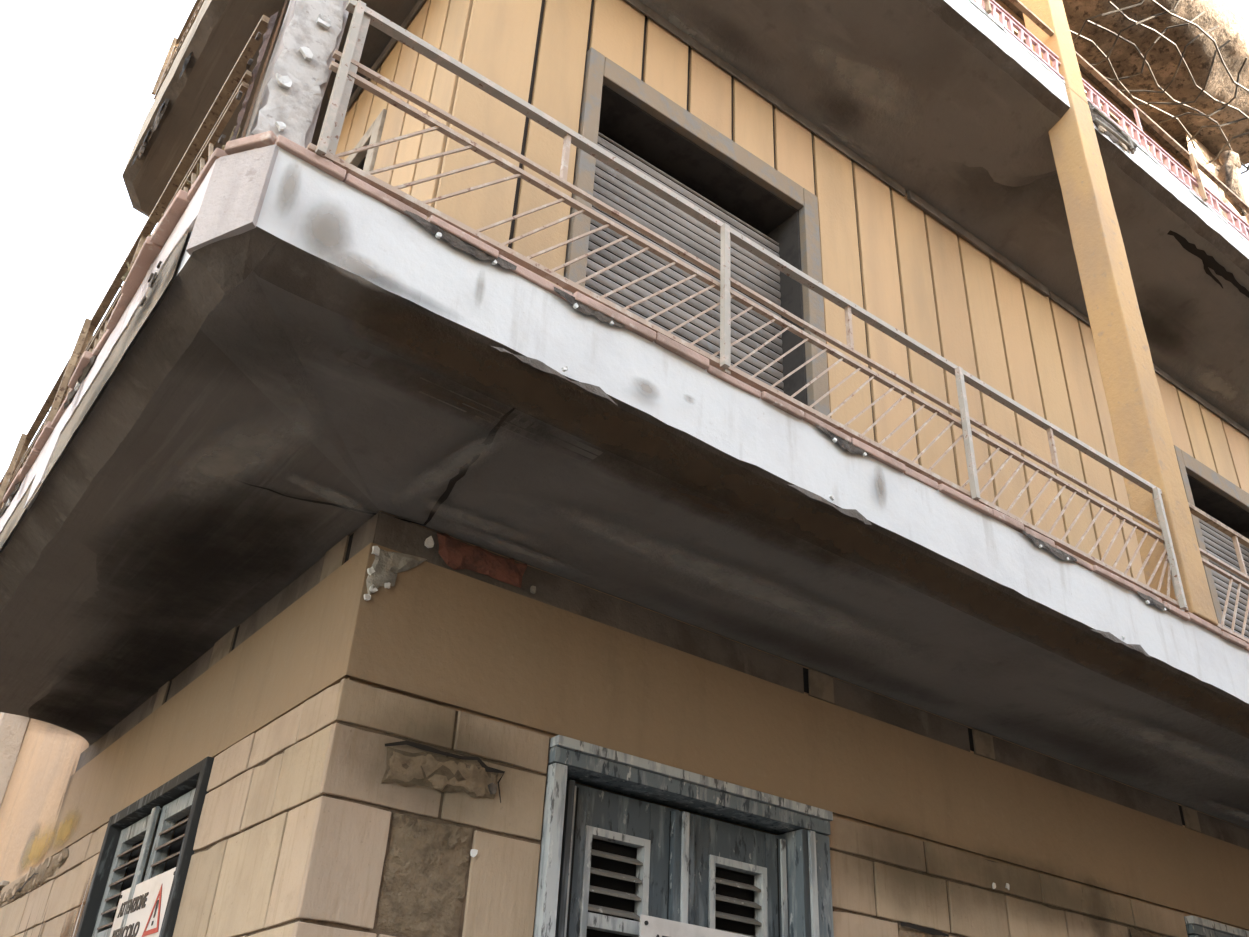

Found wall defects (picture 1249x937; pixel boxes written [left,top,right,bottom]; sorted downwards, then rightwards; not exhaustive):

spalling [251,0,345,148]
peeling [140,261,162,307]
crack [1167,230,1249,298]
spalling [64,355,96,410]
spalling [0,481,21,517]
flaking render [364,533,536,601]
water stain [20,817,74,868]